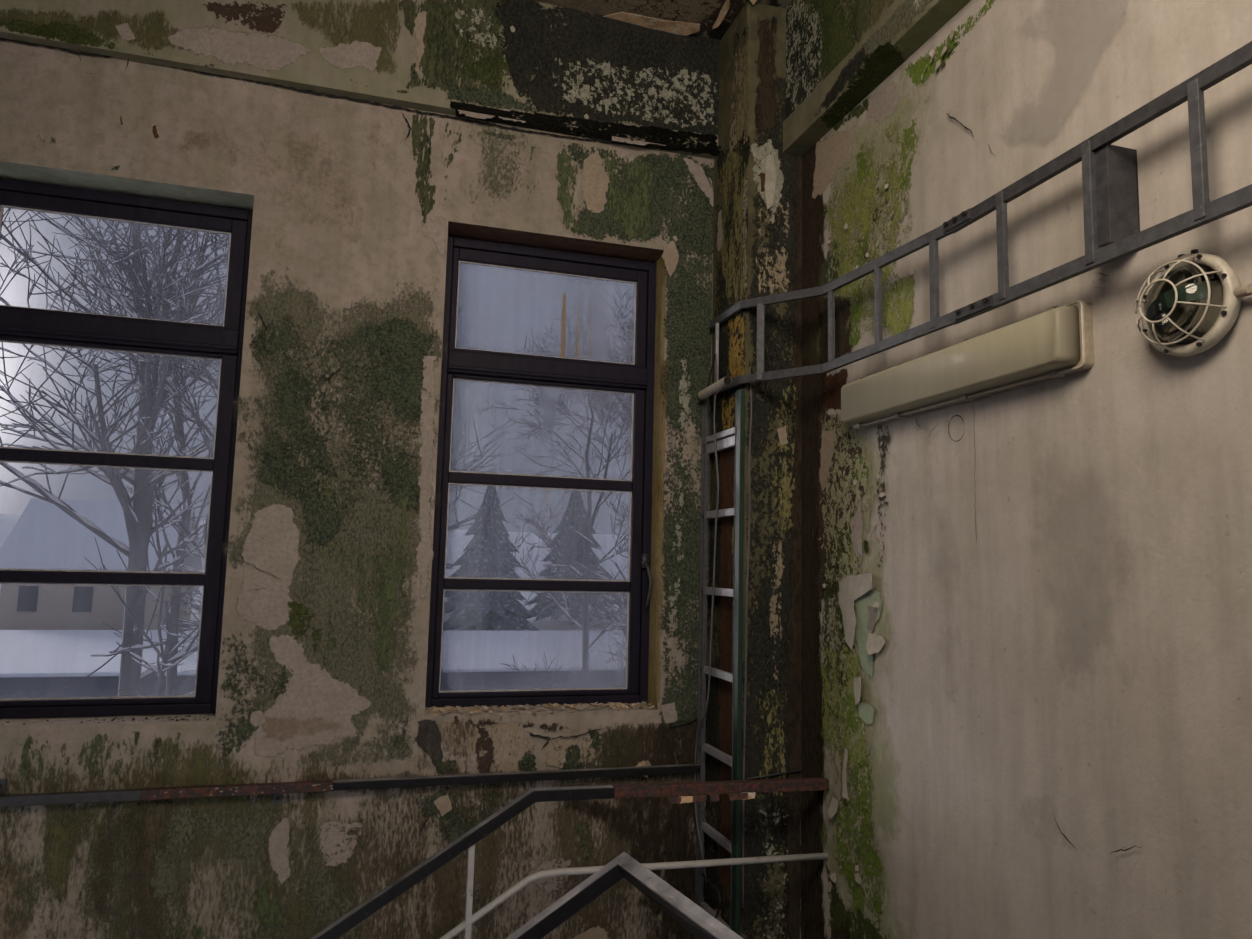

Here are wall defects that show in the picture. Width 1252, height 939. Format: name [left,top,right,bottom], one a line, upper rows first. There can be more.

peeling [115,23,135,41]
peeling [164,0,382,72]
peeling [414,11,427,72]
water stain [0,0,932,939]
peeling [235,504,371,757]
peeling [816,408,890,892]
peeling [268,817,291,884]
peeling [318,821,365,868]